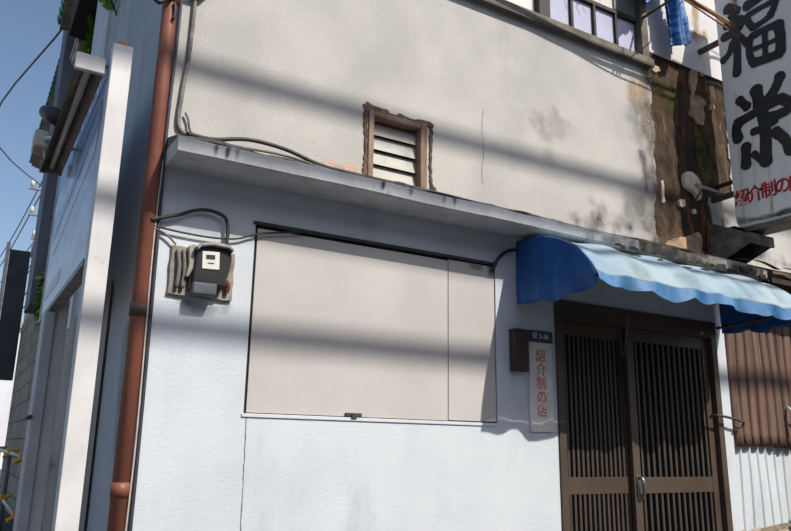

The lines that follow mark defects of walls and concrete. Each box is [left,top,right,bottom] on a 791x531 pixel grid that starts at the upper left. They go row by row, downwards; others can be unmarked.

corrosion [691,0,706,41]
spalling [323,101,437,191]
spalling [604,54,770,282]